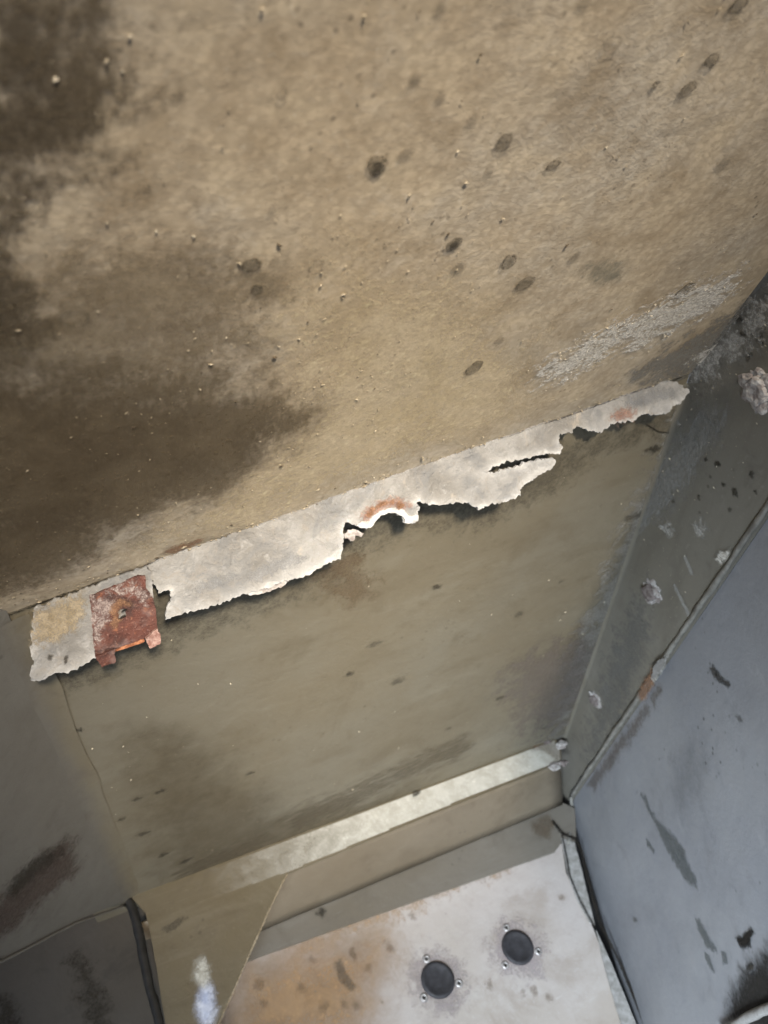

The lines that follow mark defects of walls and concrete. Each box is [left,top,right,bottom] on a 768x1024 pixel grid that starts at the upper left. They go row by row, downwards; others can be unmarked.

leakage [0,0,517,596]
rust [30,380,690,681]